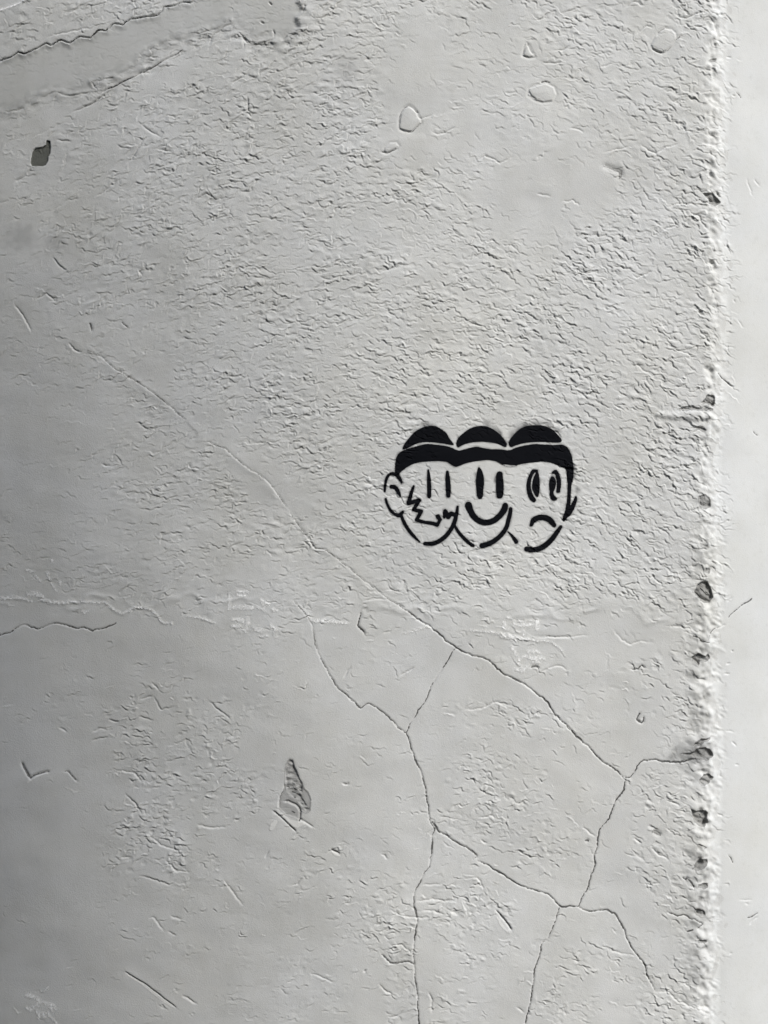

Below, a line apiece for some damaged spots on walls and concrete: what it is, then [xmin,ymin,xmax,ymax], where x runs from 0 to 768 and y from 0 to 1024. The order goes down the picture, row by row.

crack [3,2,190,60]
crack [101,50,182,93]
hole [31,140,51,166]
crack [88,350,184,419]
hole [694,568,713,603]
crack [0,623,116,636]
hole [691,653,710,666]
crack [208,441,703,1024]
hole [681,737,714,786]
spalling [269,759,311,831]
hole [691,809,708,827]
hole [692,844,708,871]